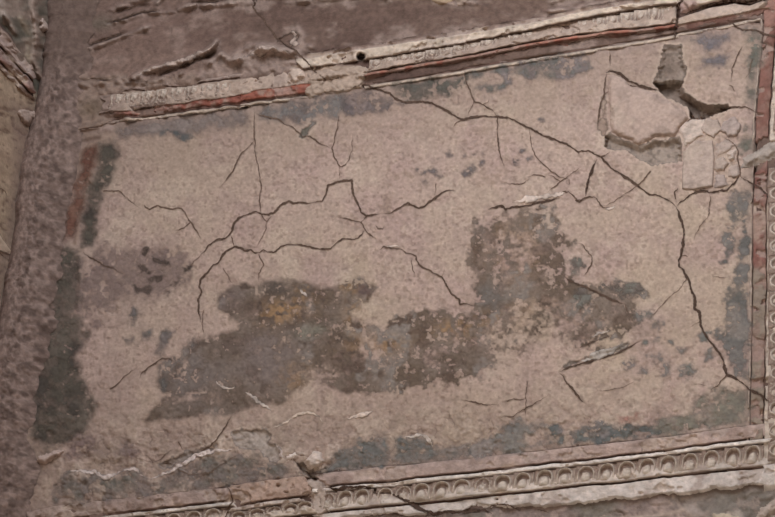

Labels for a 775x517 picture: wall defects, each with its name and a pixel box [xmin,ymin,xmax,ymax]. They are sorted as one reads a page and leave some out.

peeling [235,31,299,62]
crack [87,56,209,82]
peeling [597,44,731,166]
crack [353,0,775,406]
crack [85,115,473,331]
flaking render [0,236,11,254]
damp [571,257,586,275]
damp [33,144,191,454]
damp [599,280,644,299]
crack [216,381,271,410]
crack [462,382,545,418]
crack [293,459,549,516]